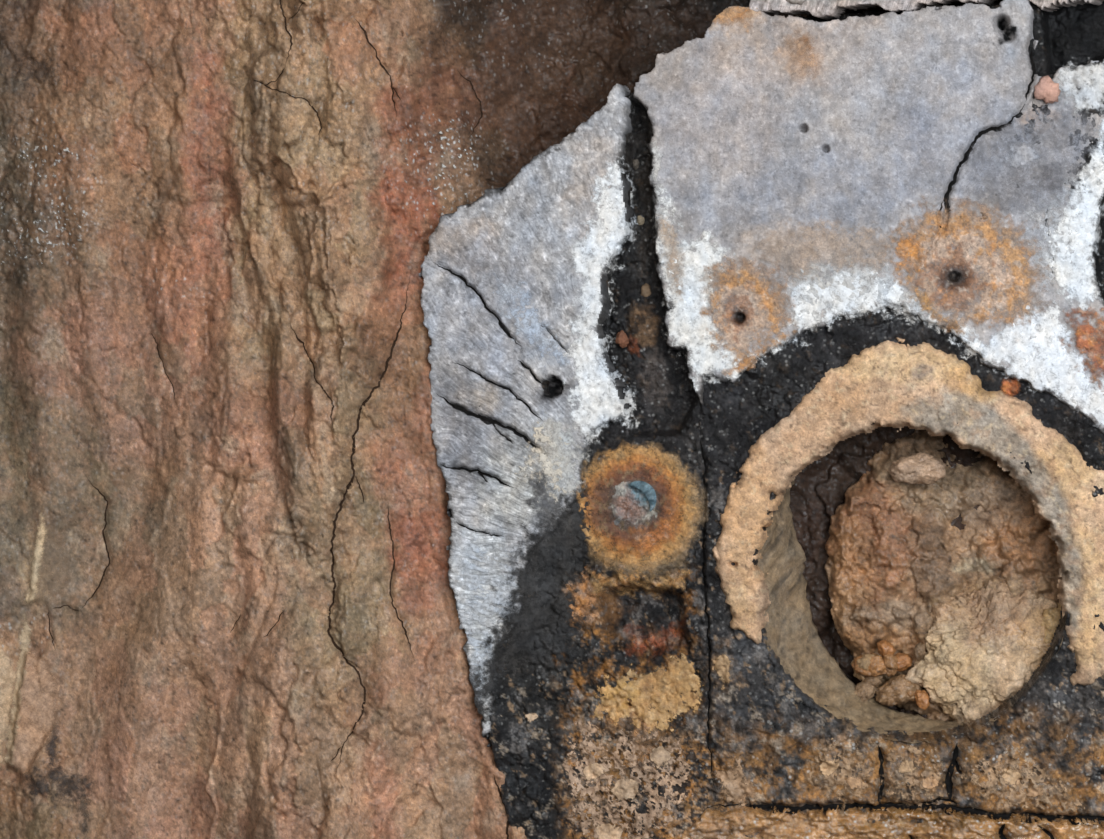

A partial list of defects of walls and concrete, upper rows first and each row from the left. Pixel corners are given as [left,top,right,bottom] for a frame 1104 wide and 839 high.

crack [254,0,322,137]
crack [354,18,402,113]
crack [939,51,1035,228]
damp [493,157,638,545]
corrosion [700,257,791,374]
corrosion [895,201,1044,333]
corrosion [1062,308,1104,388]
crack [291,262,545,774]
corrosion [564,443,708,627]
damp [450,536,519,714]